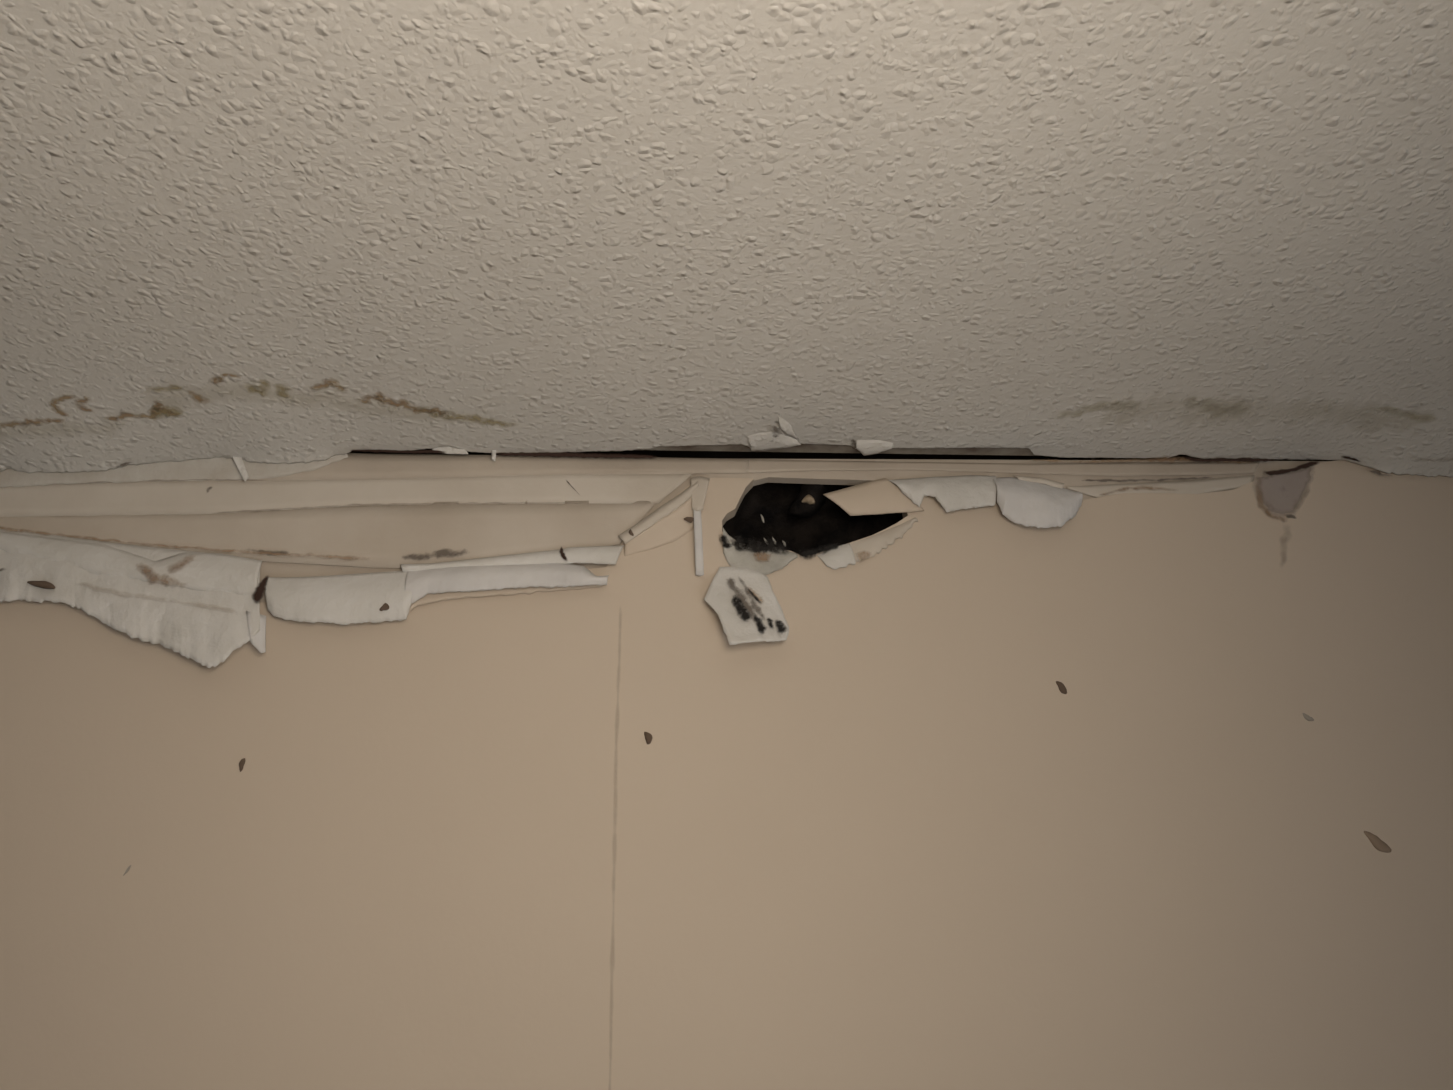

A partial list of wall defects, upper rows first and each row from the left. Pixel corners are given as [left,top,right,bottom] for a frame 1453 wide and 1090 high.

water stain [4,396,91,427]
water stain [108,386,204,421]
water stain [362,393,505,425]
crack [351,415,1383,475]
peeling [0,449,1336,668]